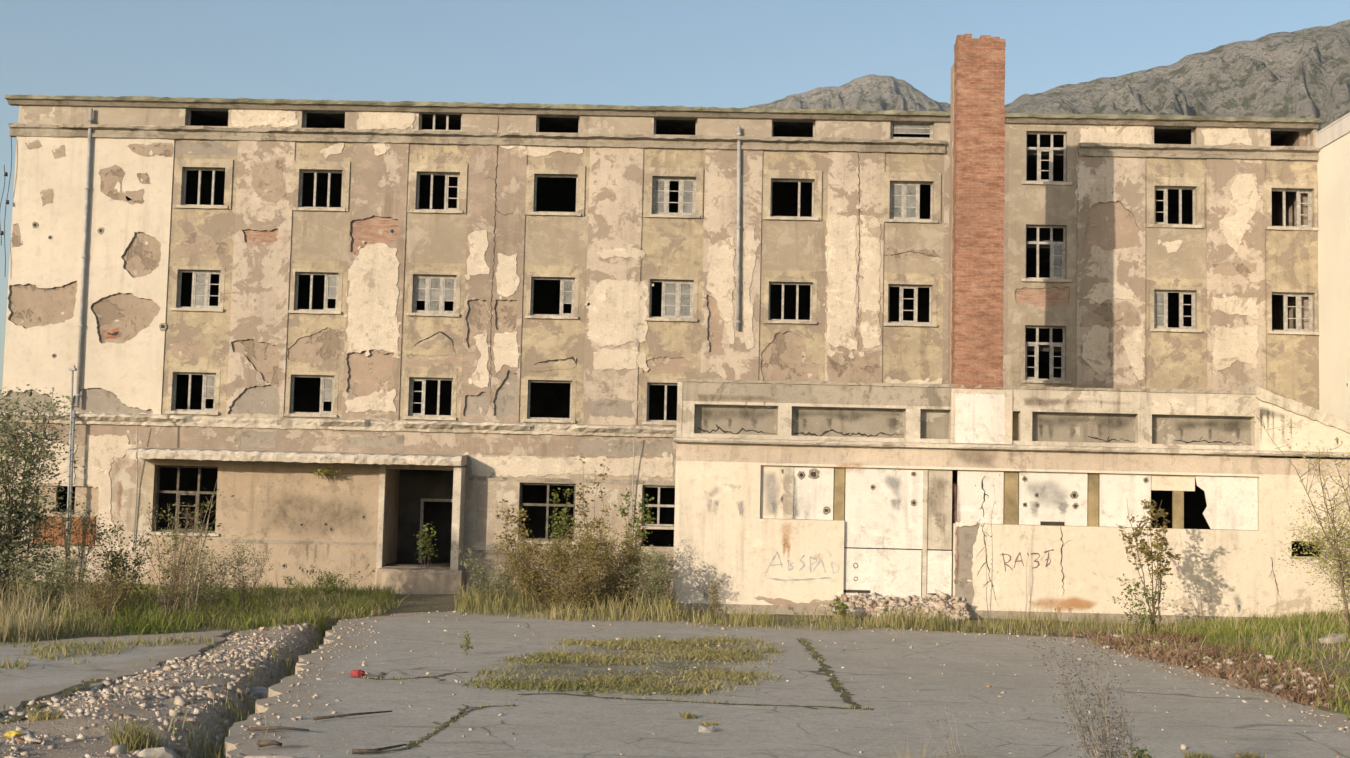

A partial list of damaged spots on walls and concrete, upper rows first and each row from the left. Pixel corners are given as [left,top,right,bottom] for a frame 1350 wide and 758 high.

flaking render [9,281,78,329]
flaking render [92,232,167,344]